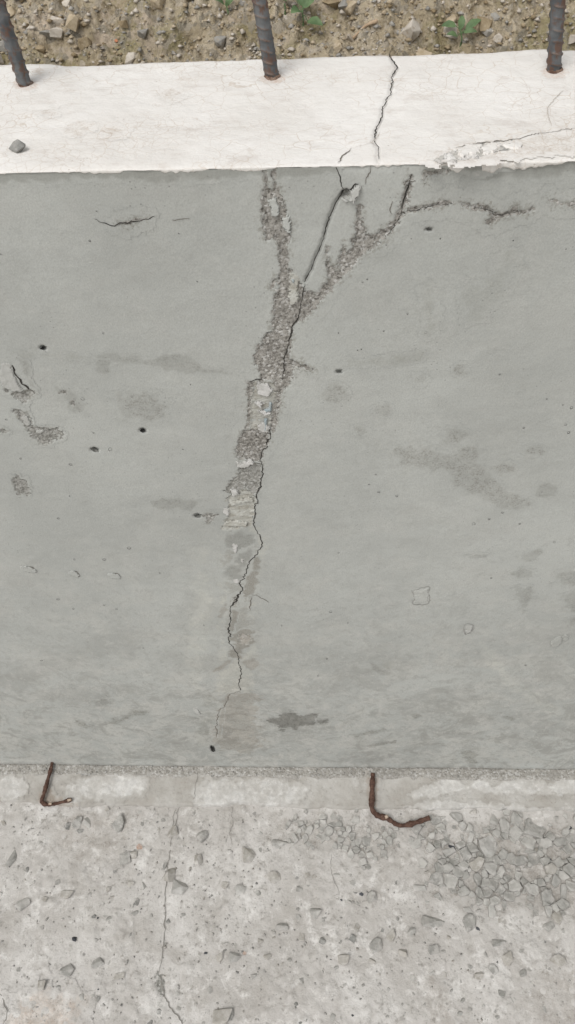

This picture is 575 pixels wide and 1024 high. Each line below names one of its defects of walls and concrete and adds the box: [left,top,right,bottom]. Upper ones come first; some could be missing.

crack [456,91,572,148]
crack [96,205,189,240]
crack [282,54,398,377]
crack [387,174,549,238]
spalling [149,129,575,757]
crack [215,429,271,737]
damp [261,710,332,733]
corrosion [363,770,382,810]